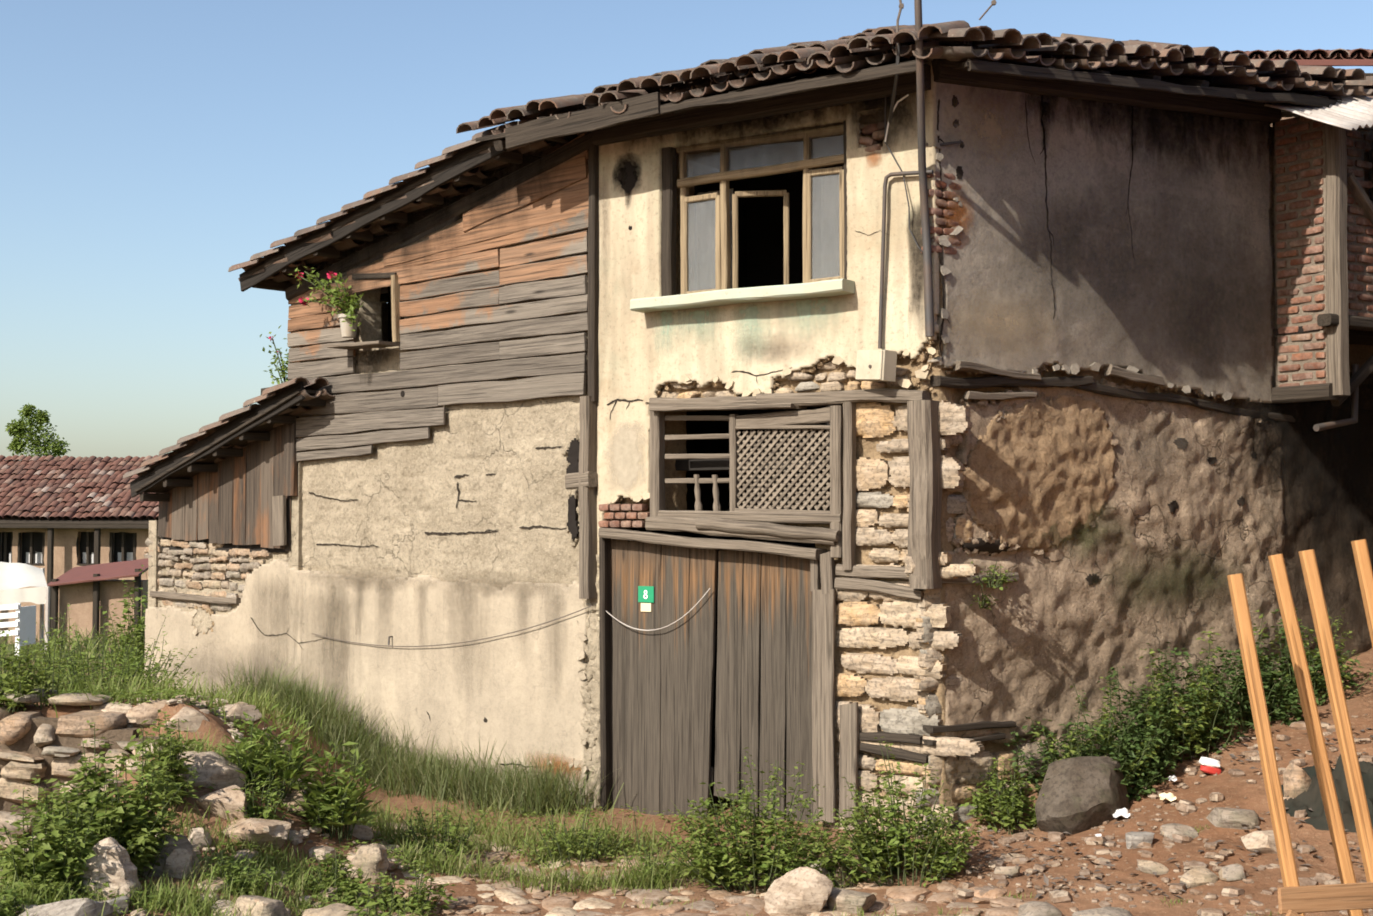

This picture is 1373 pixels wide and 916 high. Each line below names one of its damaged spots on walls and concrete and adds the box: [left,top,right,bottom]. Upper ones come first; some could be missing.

spalling [926,95,965,179]
crack [1025,99,1055,320]
spalling [897,189,1246,422]
spalling [643,356,857,402]
spalling [561,434,580,474]
spalling [566,490,579,574]
spalling [611,493,650,504]
spalling [538,555,601,808]